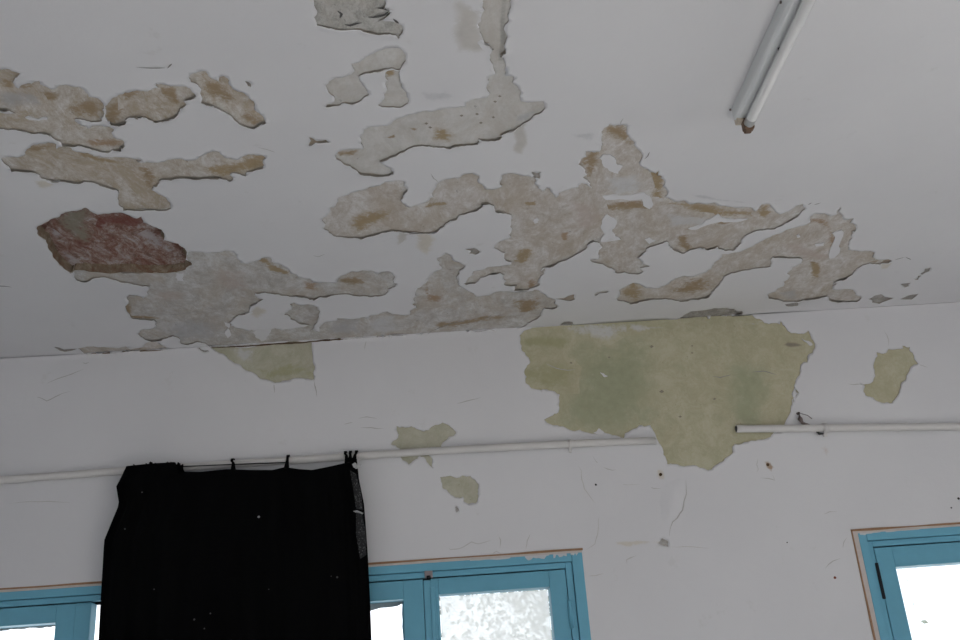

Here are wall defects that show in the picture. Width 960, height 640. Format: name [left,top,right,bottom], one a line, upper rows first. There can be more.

peeling [0,0,891,470]
peeling [864,346,917,403]
peeling [440,476,479,513]